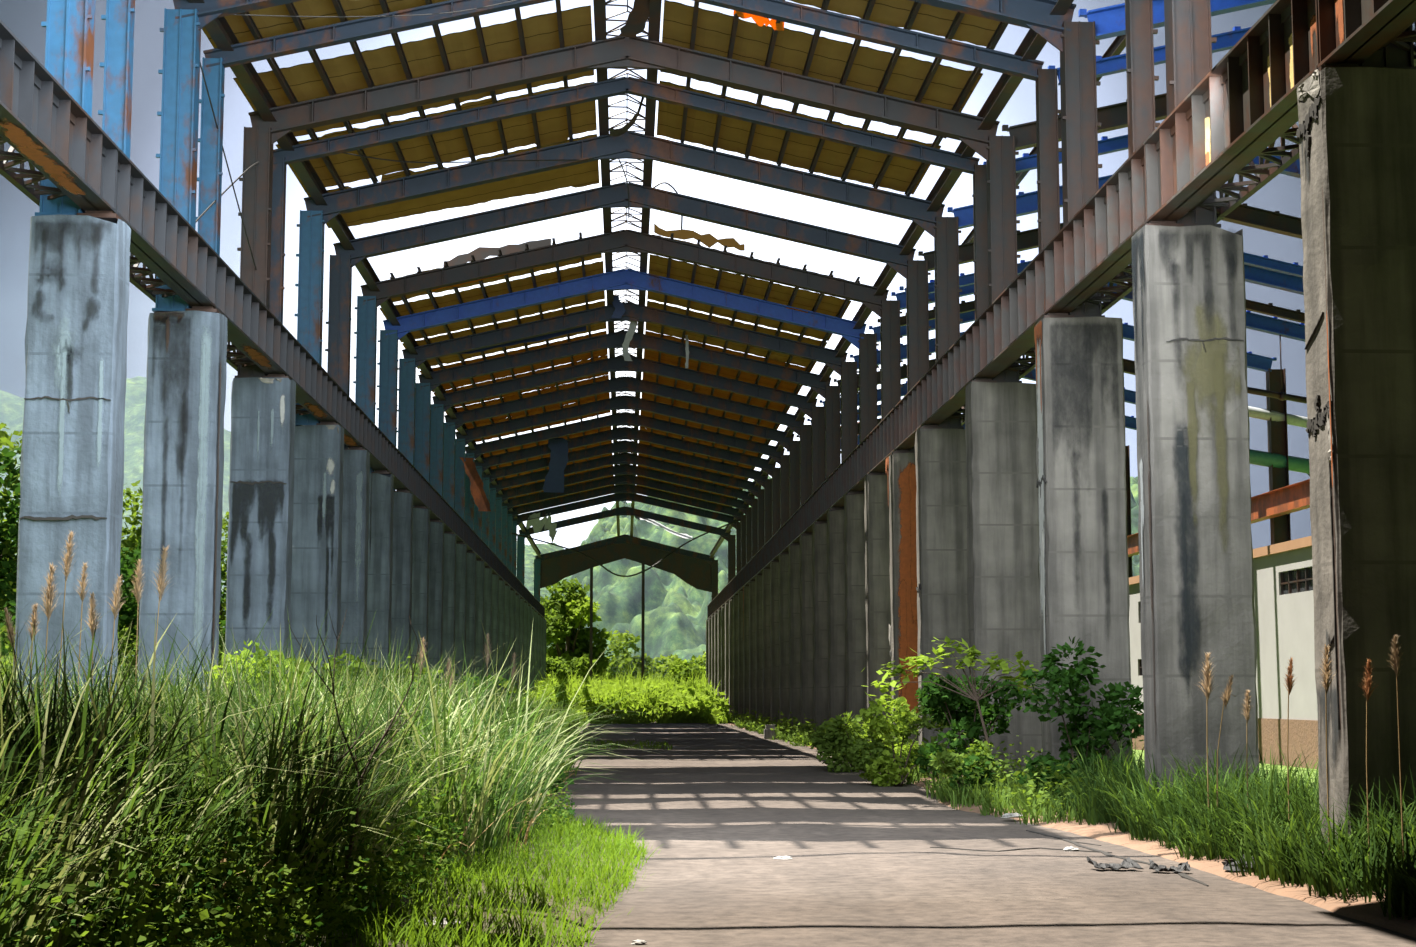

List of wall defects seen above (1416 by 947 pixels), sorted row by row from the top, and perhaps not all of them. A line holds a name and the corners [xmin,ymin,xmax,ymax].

rust [1335,0,1344,44]
spalling [1297,69,1320,101]